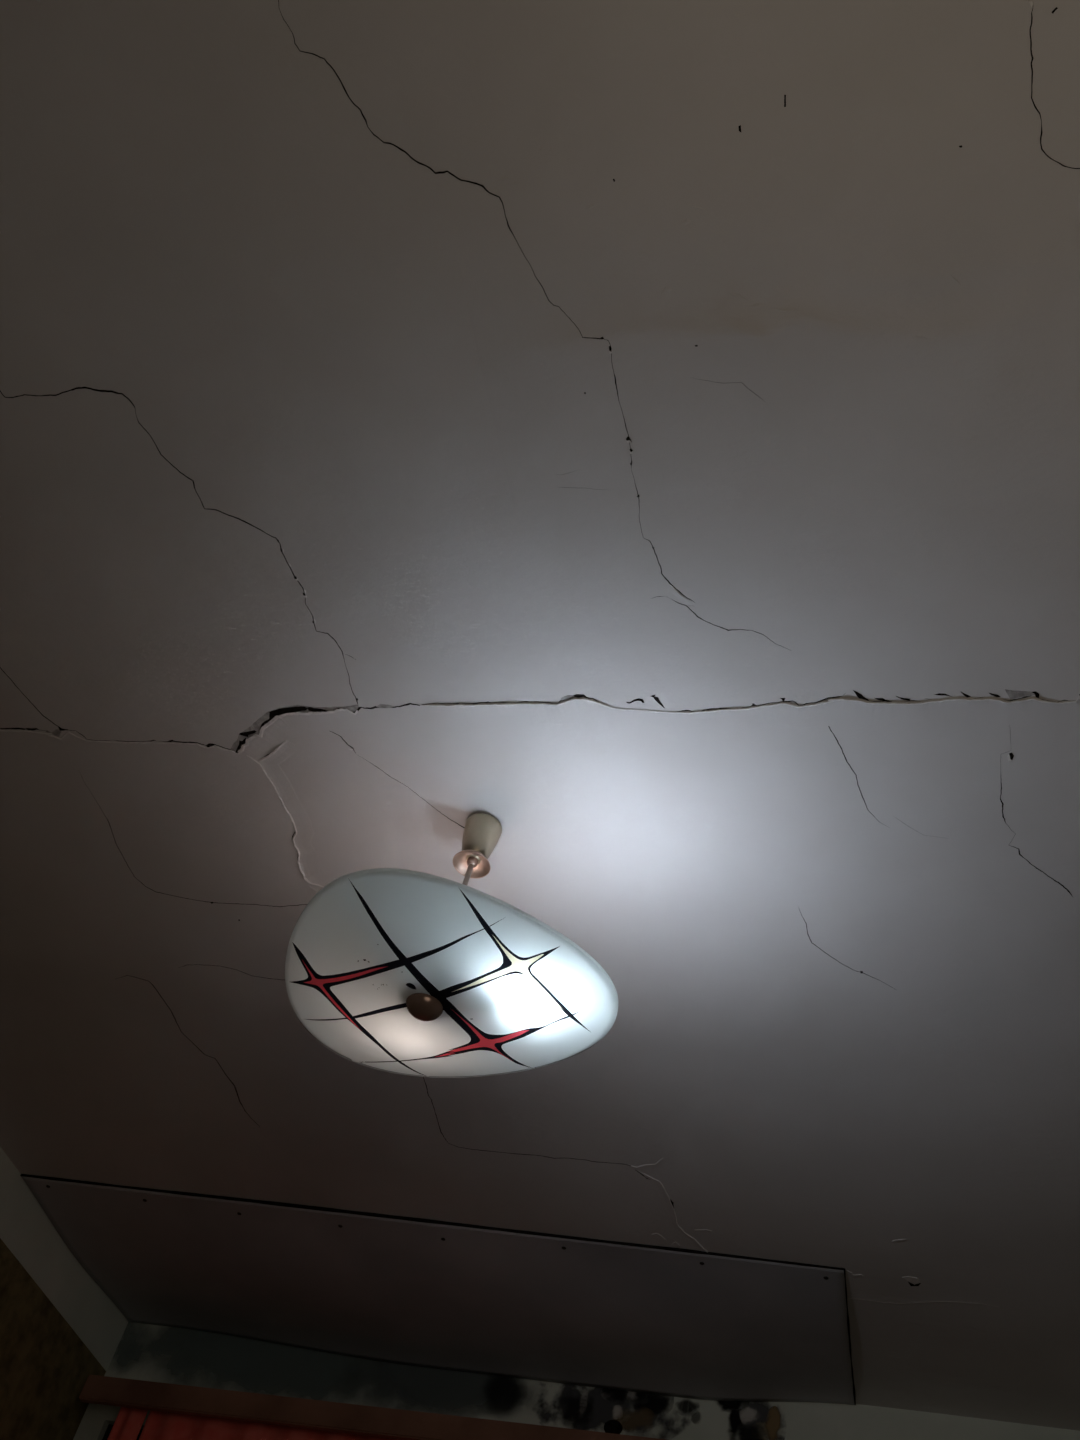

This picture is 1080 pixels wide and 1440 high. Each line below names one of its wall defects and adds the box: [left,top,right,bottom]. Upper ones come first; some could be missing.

crack [1029,1,1080,169]
crack [278,0,787,649]
crack [0,387,1080,907]
flaking render [230,705,368,892]
crack [799,909,891,987]
crack [116,964,281,1127]